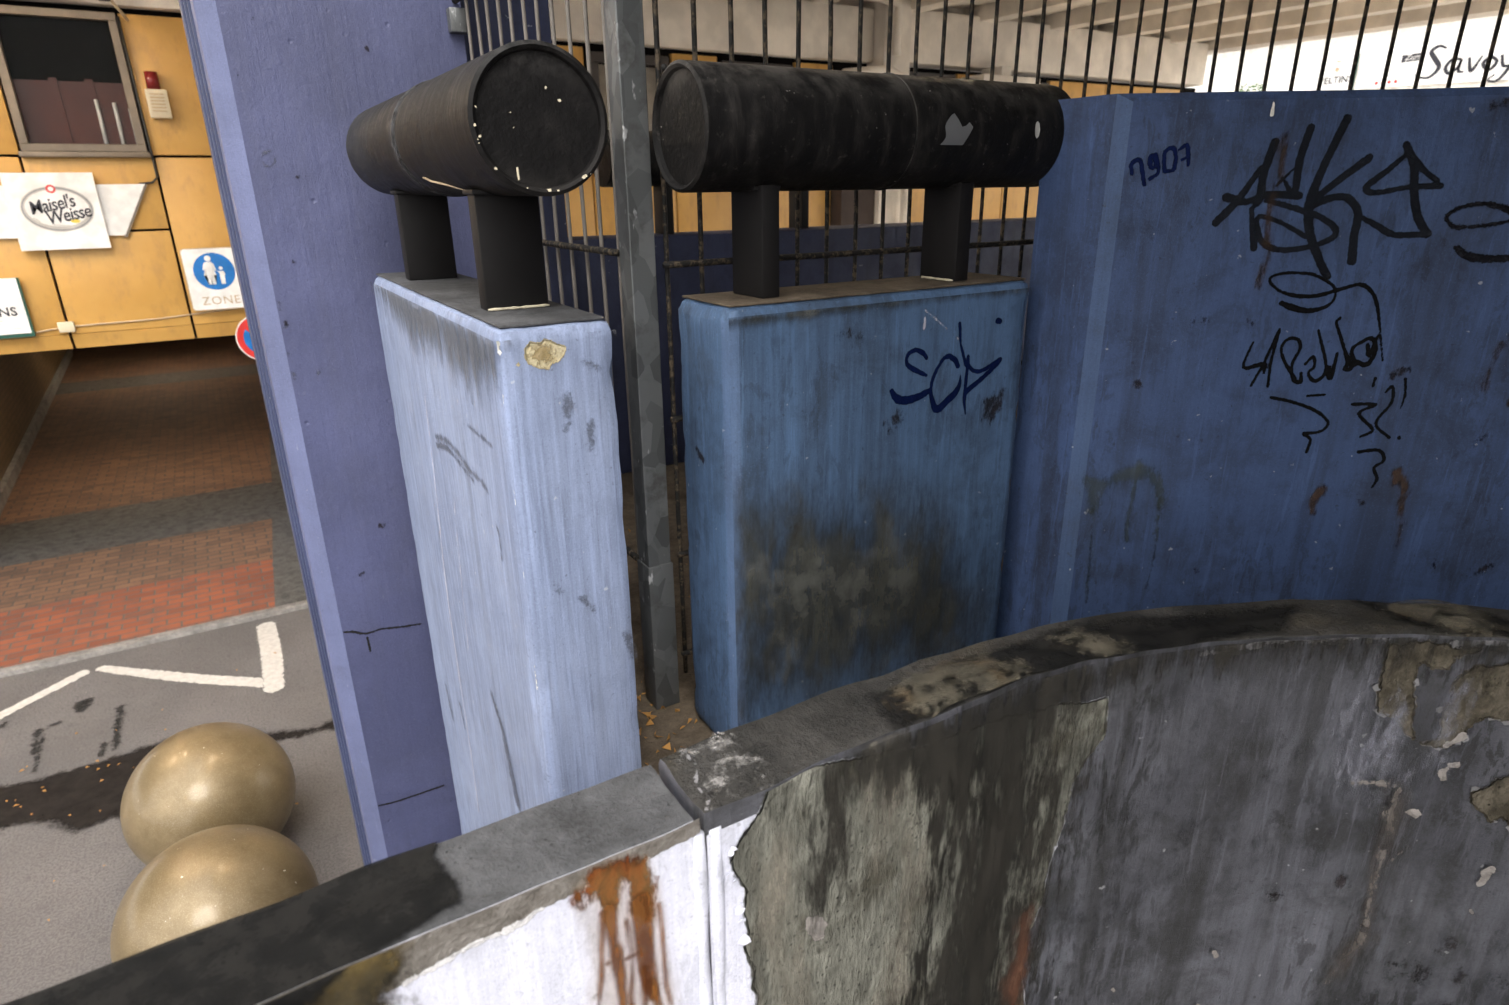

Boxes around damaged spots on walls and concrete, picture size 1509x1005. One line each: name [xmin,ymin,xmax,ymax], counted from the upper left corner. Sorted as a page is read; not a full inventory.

peeling [516,338,566,370]
crack [343,623,421,652]
peeling [1240,637,1509,781]
spalling [710,732,745,786]
peeling [1405,809,1422,819]
peeling [1469,776,1509,831]
leakage [806,778,850,918]
leakage [871,740,1107,1005]
corrosion [571,855,670,1005]